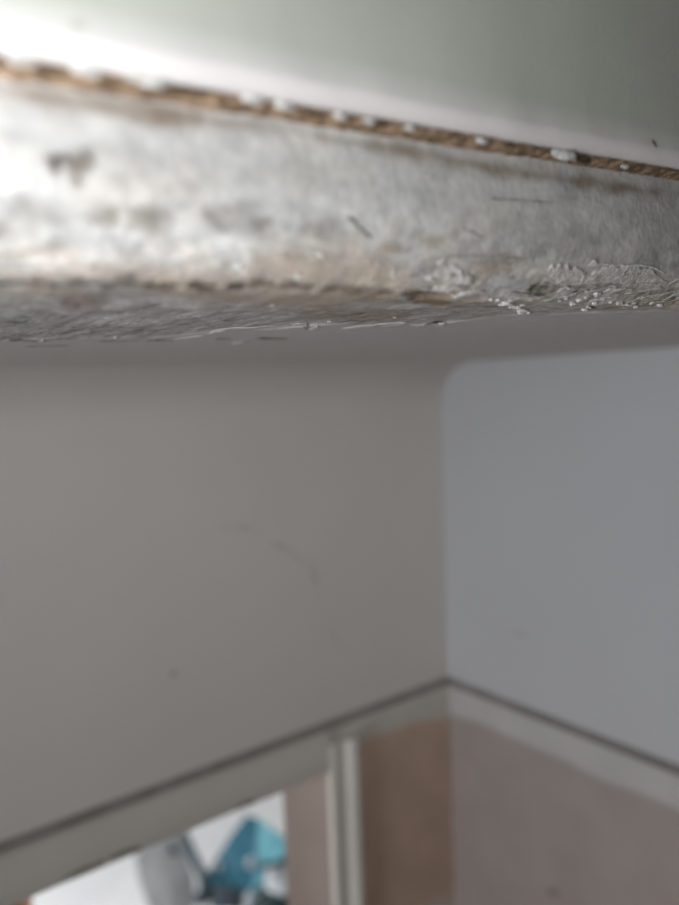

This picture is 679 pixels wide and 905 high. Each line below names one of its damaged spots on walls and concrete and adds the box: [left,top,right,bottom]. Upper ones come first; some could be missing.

spalling [0,52,679,181]
water stain [49,154,90,174]
water stain [150,264,395,314]
peeling [390,258,486,305]
peeling [507,259,679,310]
spalling [175,325,279,340]
spalling [342,313,446,330]